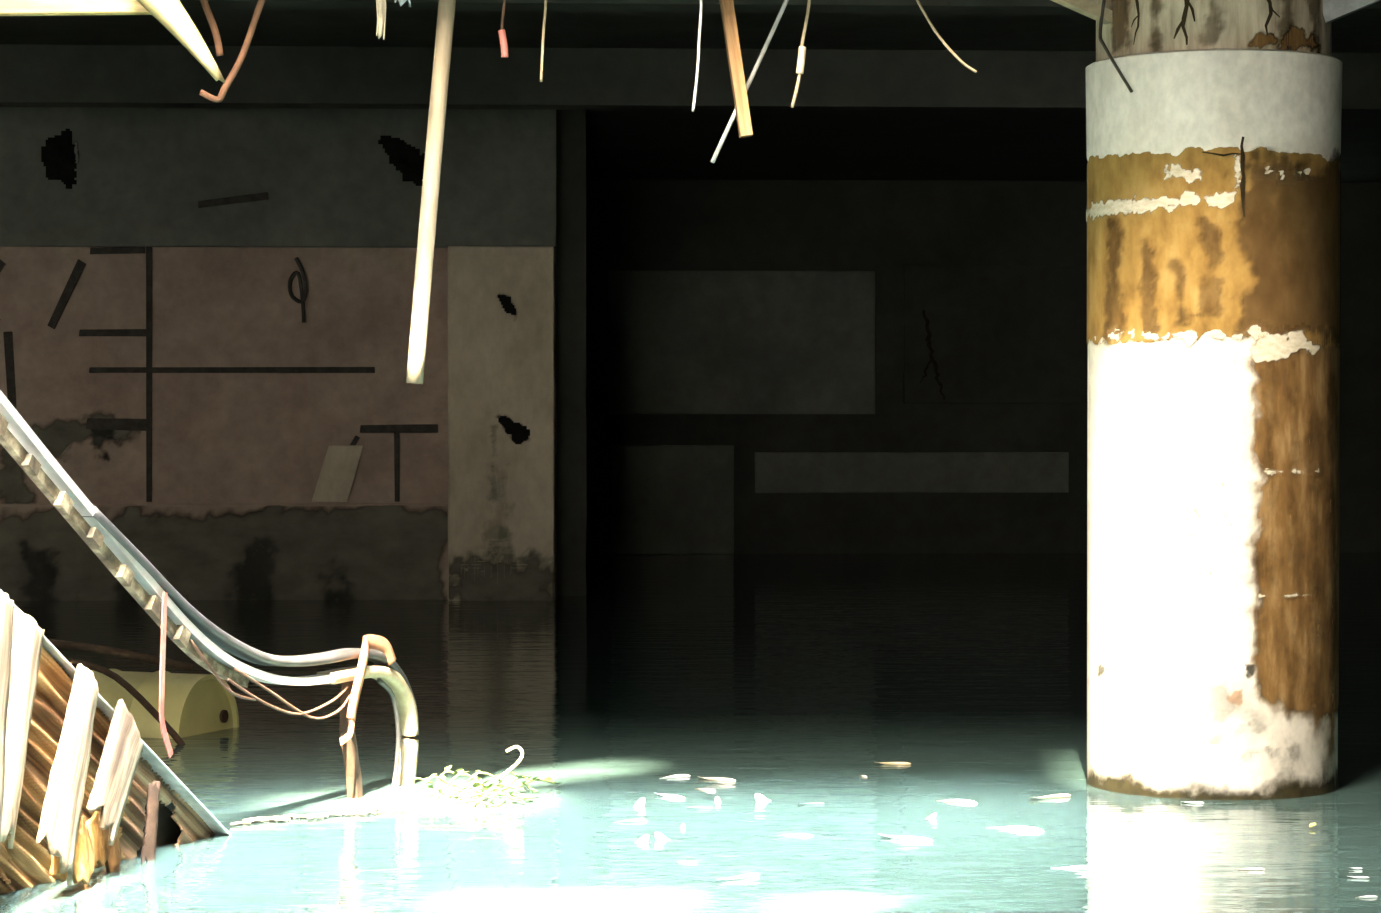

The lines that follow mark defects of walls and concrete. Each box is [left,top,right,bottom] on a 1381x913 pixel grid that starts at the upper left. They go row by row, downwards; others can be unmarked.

crack [1131,0,1140,45]
crack [1173,0,1195,45]
crack [1265,0,1280,35]
peeling [1086,147,1340,363]